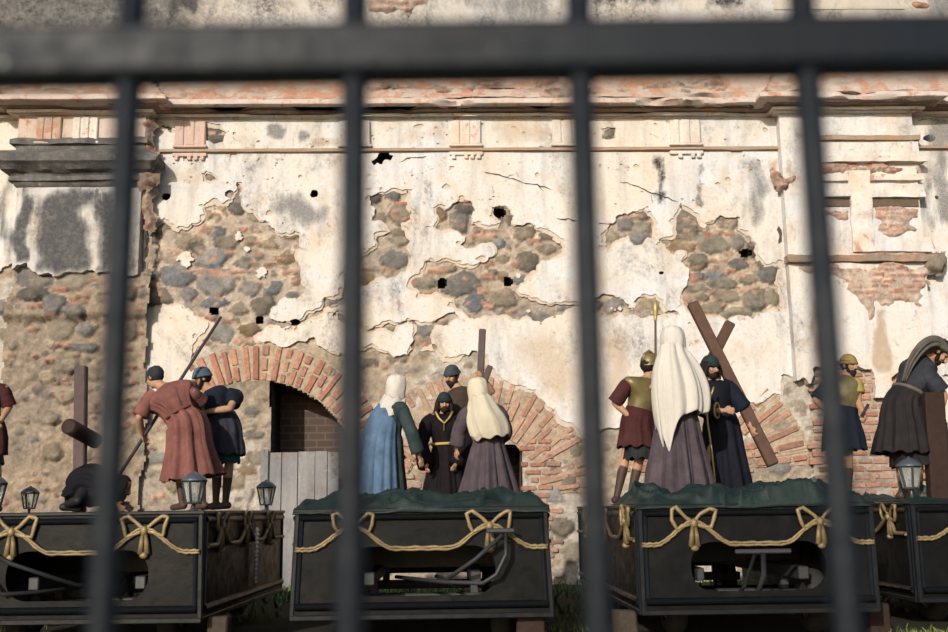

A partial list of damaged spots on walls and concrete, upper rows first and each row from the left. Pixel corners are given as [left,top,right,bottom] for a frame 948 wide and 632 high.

water stain [0,188,108,272]
flaking render [141,115,338,368]
flaking render [367,191,573,422]
crack [485,172,549,189]
flaking render [603,206,781,320]
flaking render [137,413,191,511]
flaking render [206,378,271,510]
flaking render [505,437,534,492]
flaking render [530,410,582,585]
flaking render [607,428,646,506]
flaking render [736,374,814,482]
flaking render [380,572,467,580]